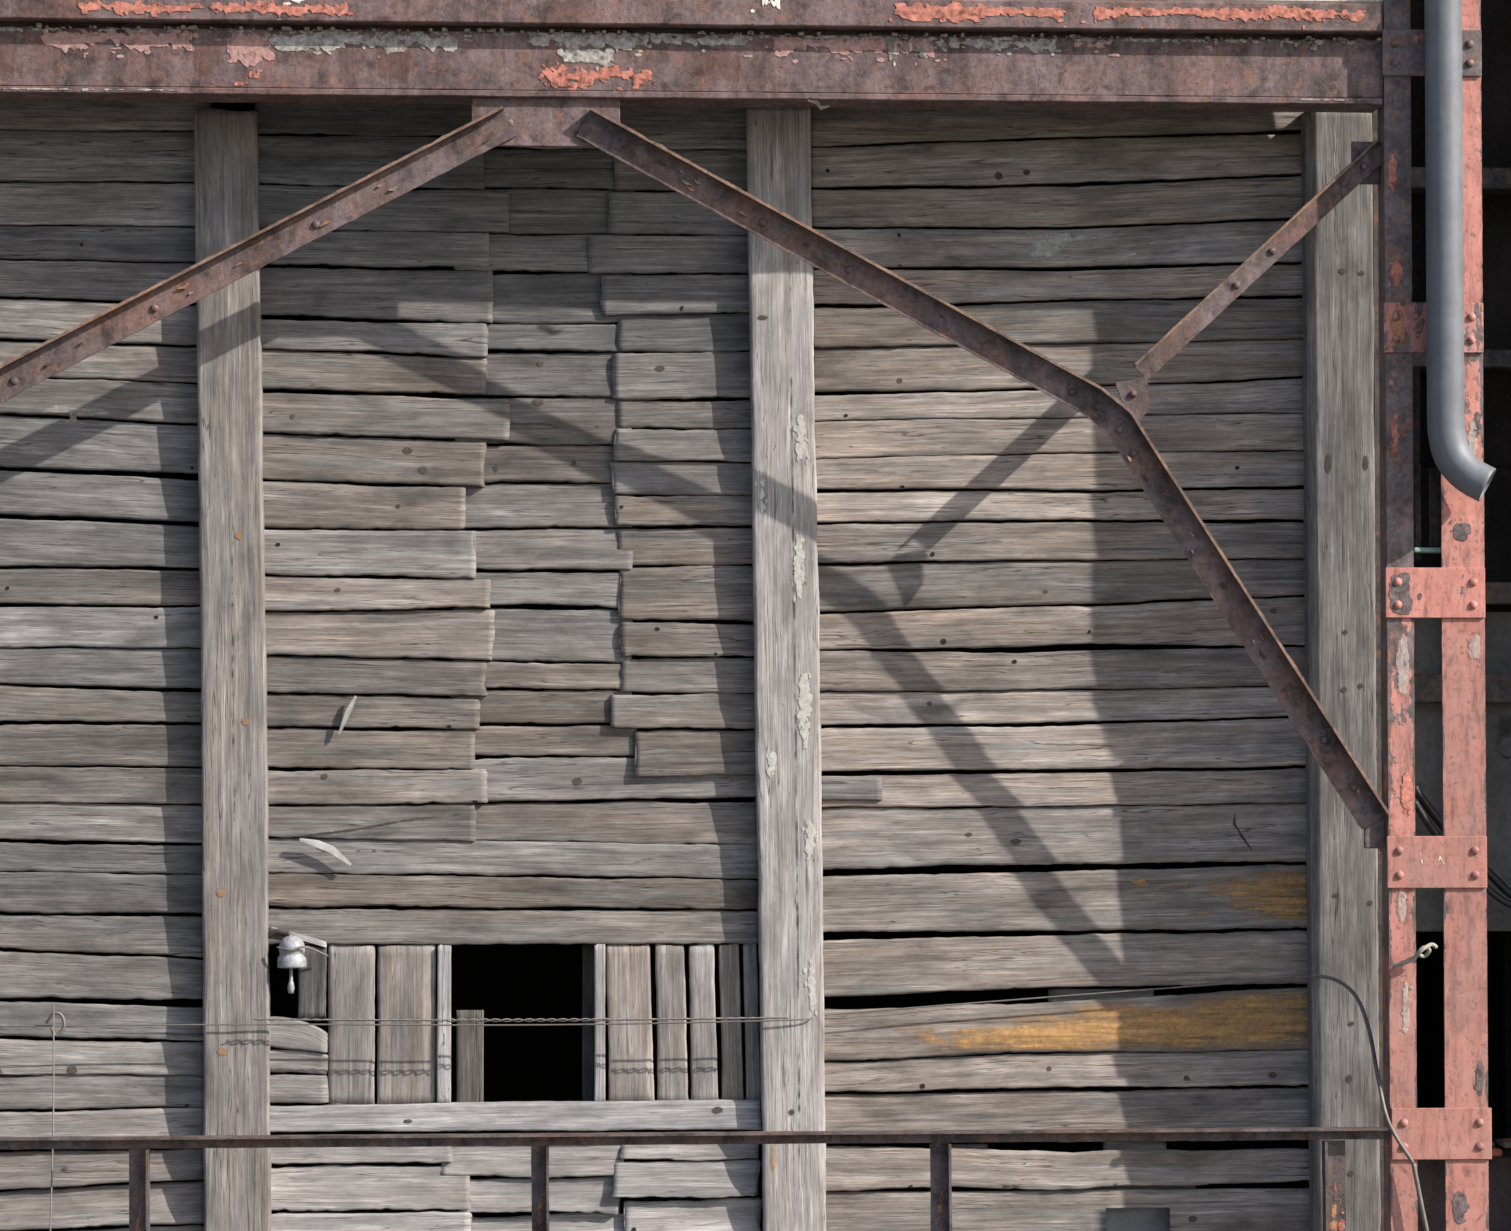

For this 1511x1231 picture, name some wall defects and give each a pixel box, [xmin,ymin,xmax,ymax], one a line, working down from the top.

peeling [0,0,1378,91]
rust [1330,1187,1338,1230]